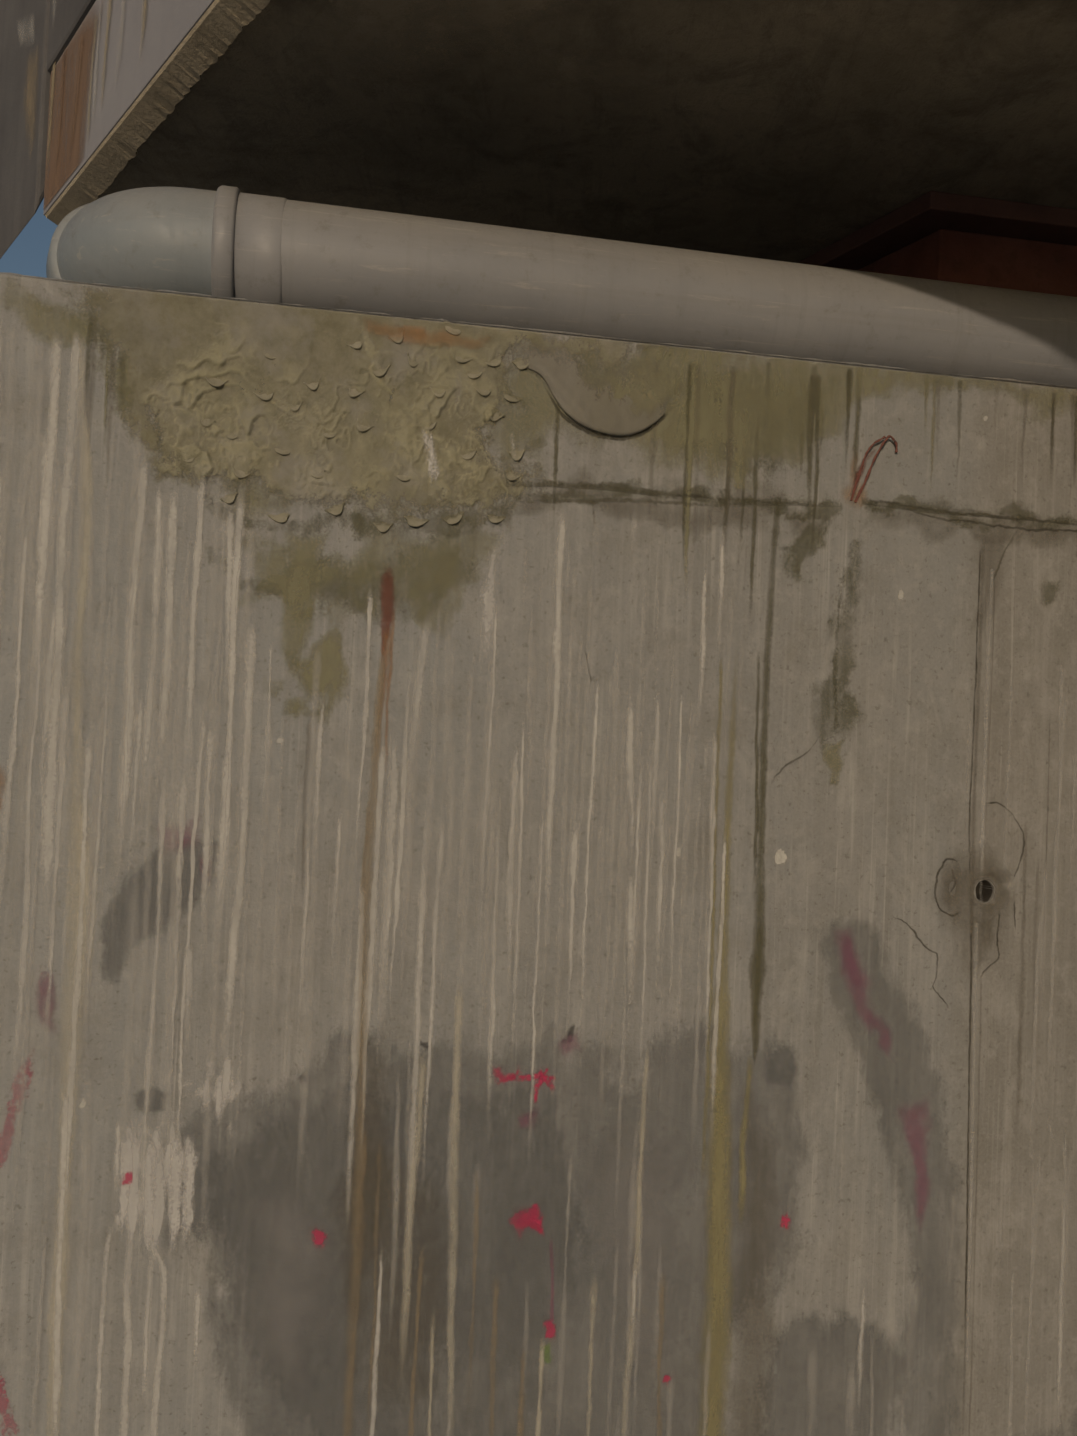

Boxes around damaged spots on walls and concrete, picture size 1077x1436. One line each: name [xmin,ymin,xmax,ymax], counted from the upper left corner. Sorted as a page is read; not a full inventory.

peeling [70,287,657,533]
crack [692,488,828,521]
water stain [647,346,916,585]
crack [869,497,1077,532]
rust [372,574,393,775]
water stain [700,544,724,714]
water stain [480,555,524,1081]
water stain [627,701,683,1018]
crack [899,919,946,1003]
water stain [703,720,767,1436]
water stain [370,1264,382,1436]
water stain [410,1336,433,1436]